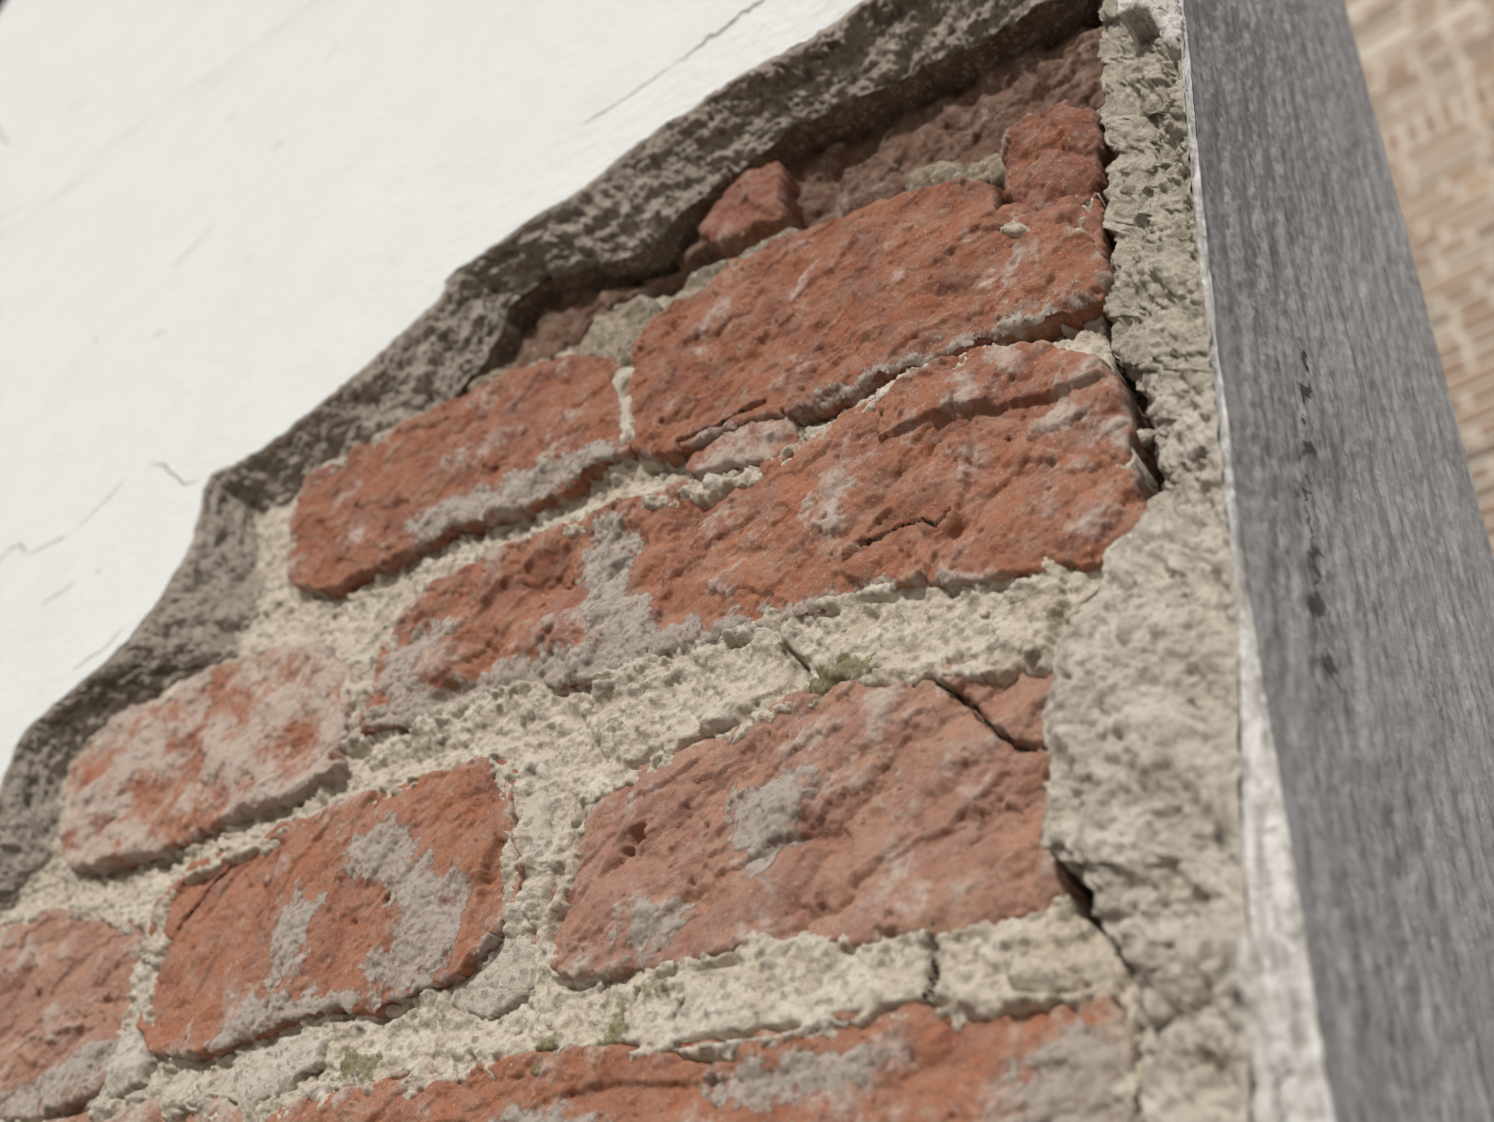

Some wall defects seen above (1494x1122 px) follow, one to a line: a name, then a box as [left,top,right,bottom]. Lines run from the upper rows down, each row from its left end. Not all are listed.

crack [1128,379,1169,493]
spalling [0,0,1159,1122]
crack [934,680,1046,752]
crack [1085,886,1122,950]
crack [921,946,940,1008]